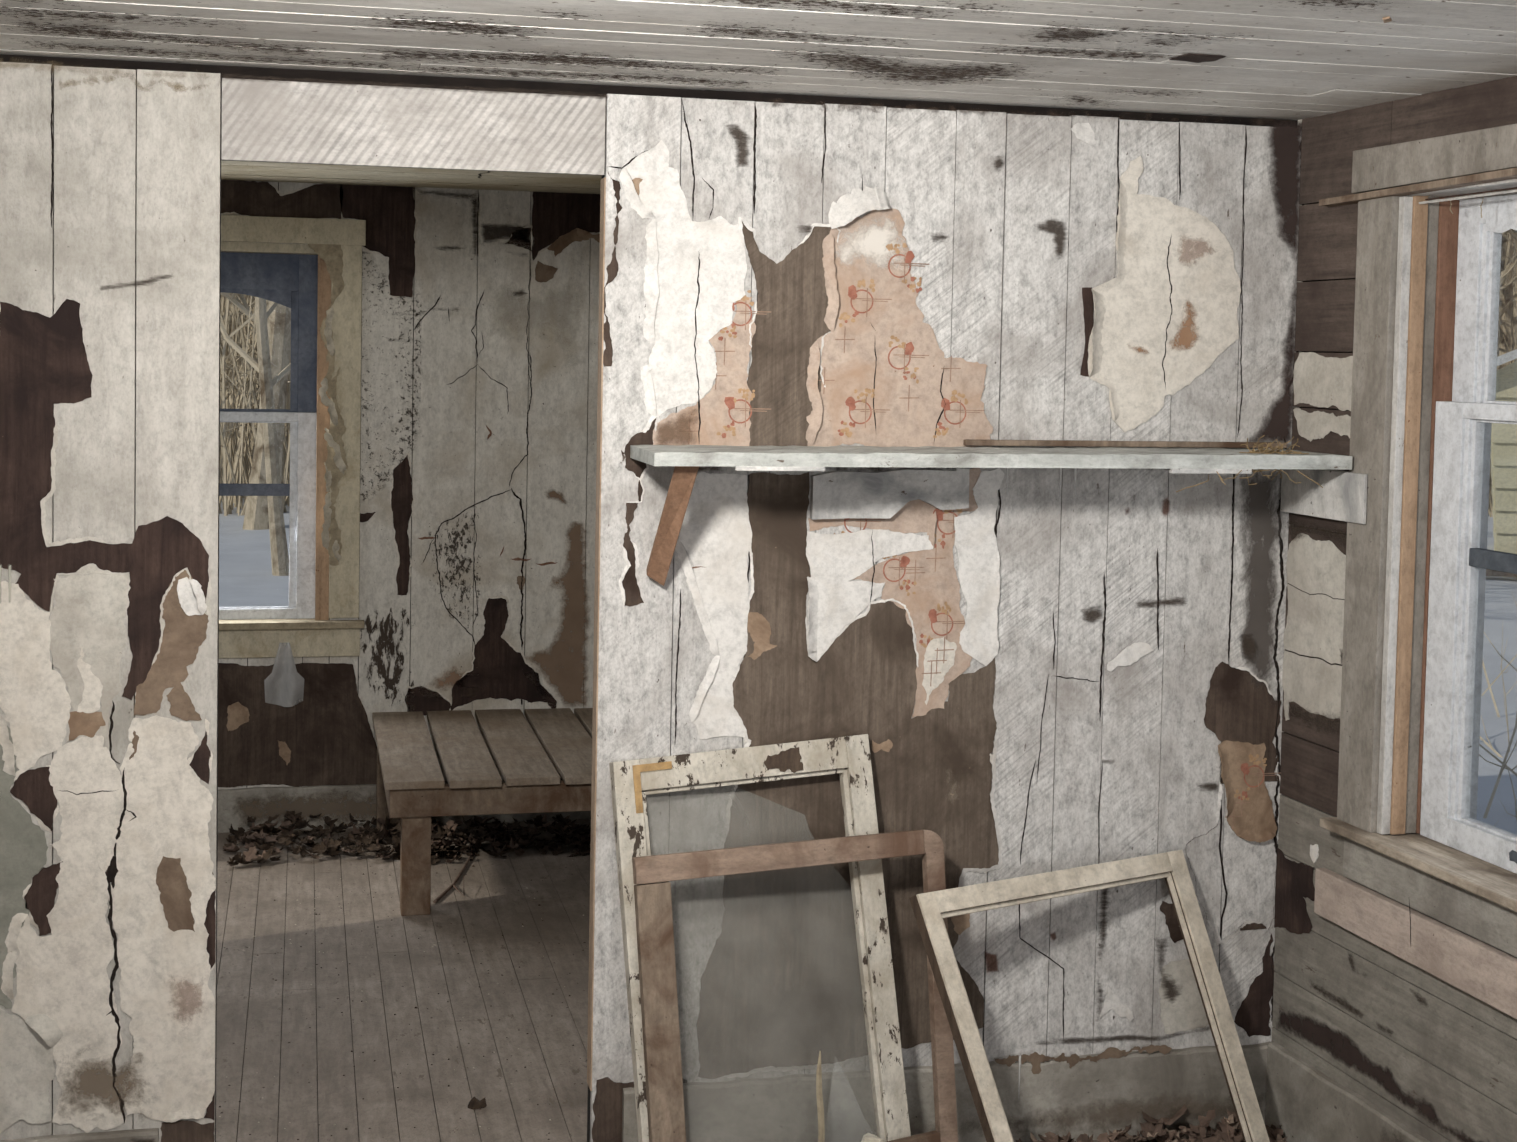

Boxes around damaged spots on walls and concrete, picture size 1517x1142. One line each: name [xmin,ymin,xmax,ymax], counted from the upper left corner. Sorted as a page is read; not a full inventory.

crack [476,171,490,253]
peeling [0,299,212,700]
crack [414,259,532,647]
peeling [619,415,660,607]
peeling [738,217,840,446]
peeling [1293,352,1353,442]
peeling [77,649,103,713]
peeling [405,595,557,716]
peeling [10,765,59,832]
peeling [1186,533,1346,1037]
peeling [23,861,63,936]
crack [59,702,136,1123]